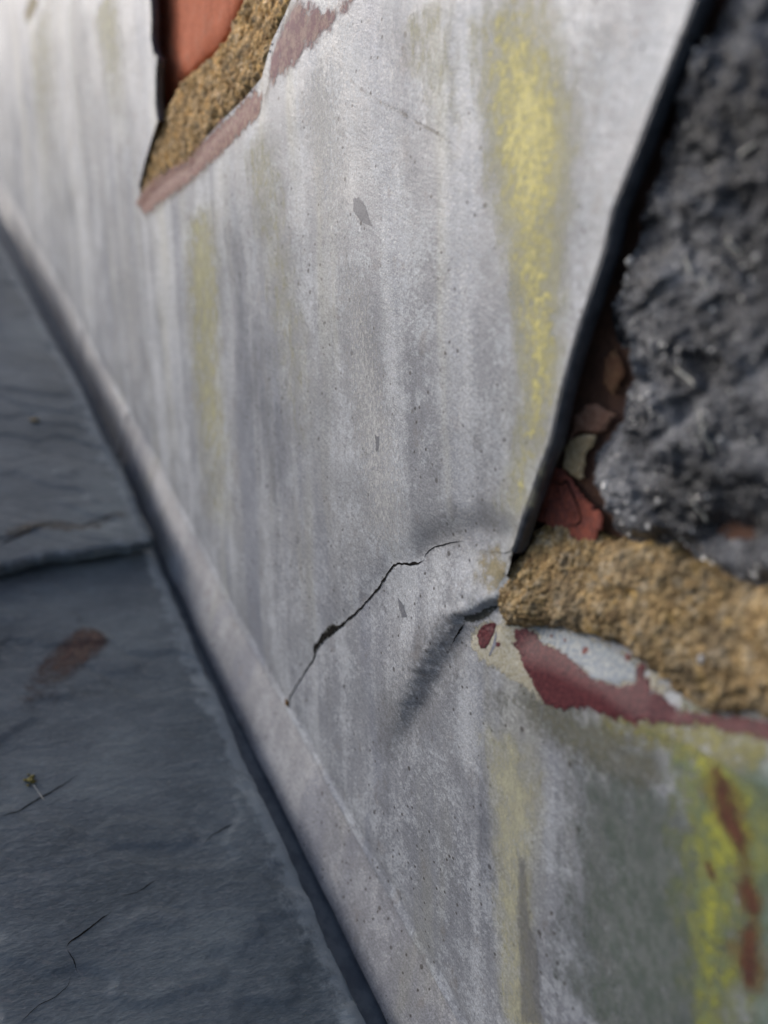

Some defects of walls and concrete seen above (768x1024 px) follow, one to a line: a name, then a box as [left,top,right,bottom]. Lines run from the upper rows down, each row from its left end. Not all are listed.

peeling [270,0,352,85]
peeling [136,89,263,214]
water stain [471,1,611,504]
spalling [603,350,625,395]
spalling [537,403,616,541]
crack [288,541,515,702]
peeling [471,619,768,741]